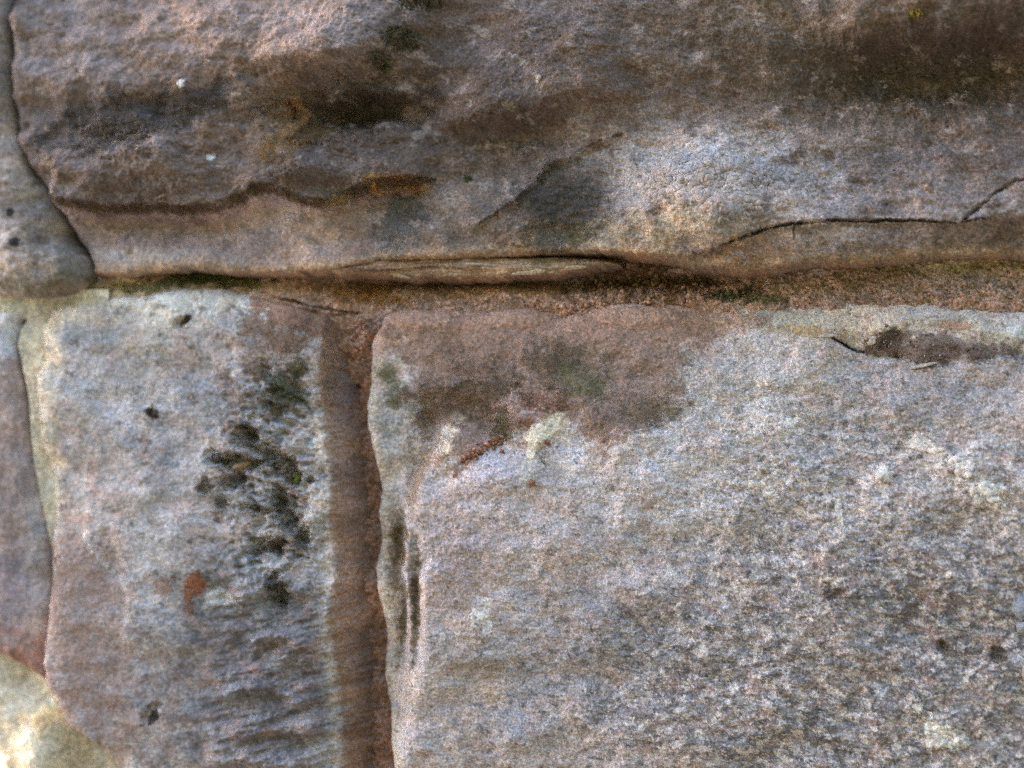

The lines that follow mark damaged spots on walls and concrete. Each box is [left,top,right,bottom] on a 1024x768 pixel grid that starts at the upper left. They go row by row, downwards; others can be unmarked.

crack [721,180,1021,246]
damp [263,391,307,412]
damp [208,588,241,607]